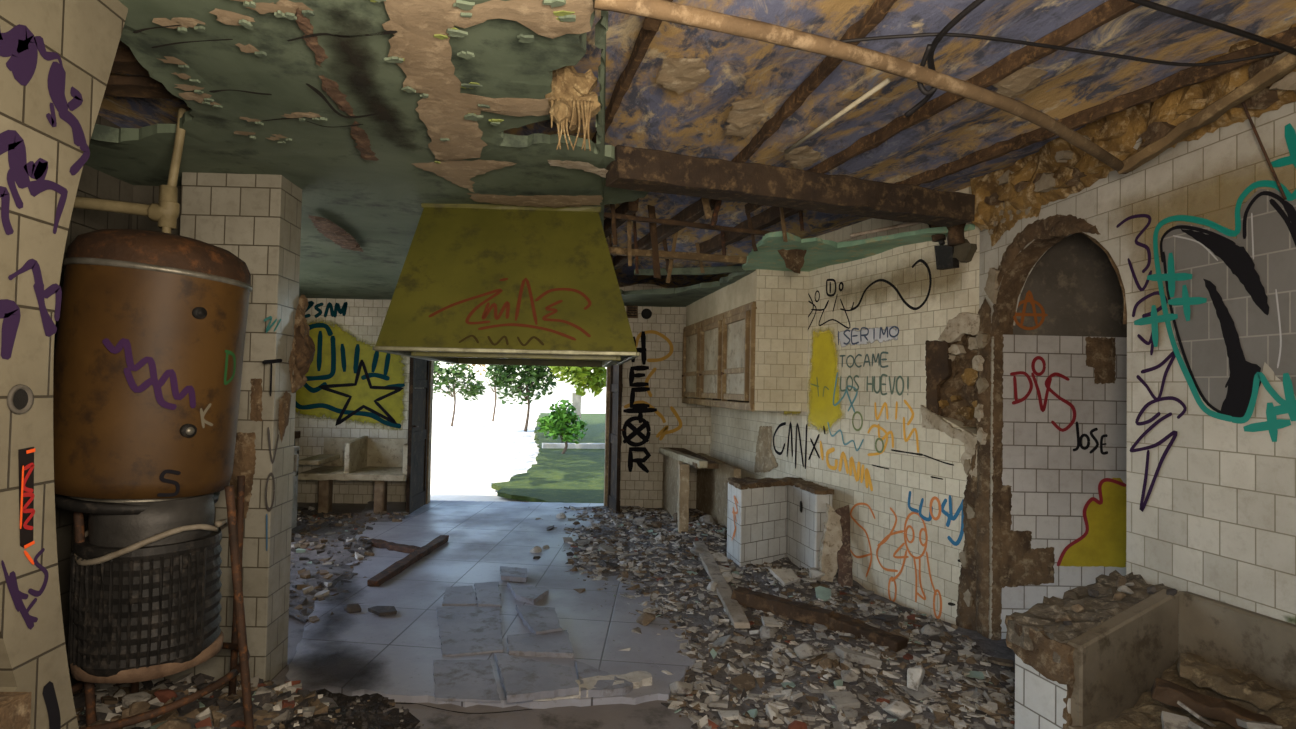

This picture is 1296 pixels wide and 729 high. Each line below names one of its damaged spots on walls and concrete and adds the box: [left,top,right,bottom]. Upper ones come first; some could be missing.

spalling [152,0,379,161]
peeling [370,0,609,208]
spalling [920,63,1296,729]